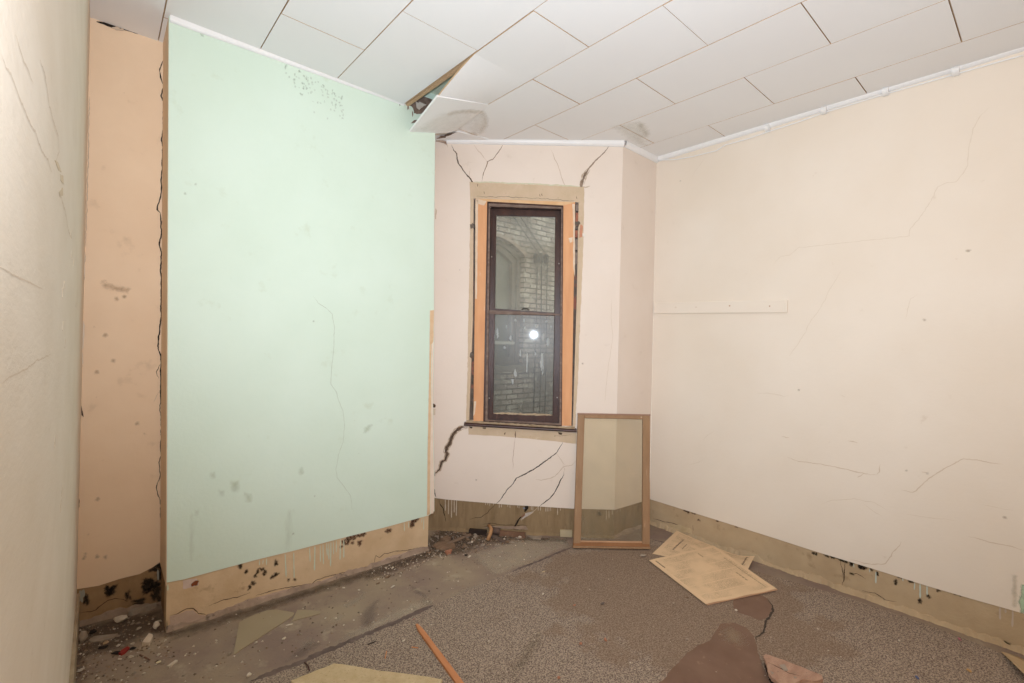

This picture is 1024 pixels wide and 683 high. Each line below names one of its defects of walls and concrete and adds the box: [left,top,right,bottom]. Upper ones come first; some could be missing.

flaking render [399,97,432,123]
crack [2,36,72,239]
crack [447,145,503,182]
crack [552,148,608,188]
crack [97,21,163,499]
crack [434,425,467,521]
crack [472,442,573,520]
leakage [104,563,165,605]
leakage [238,561,296,590]